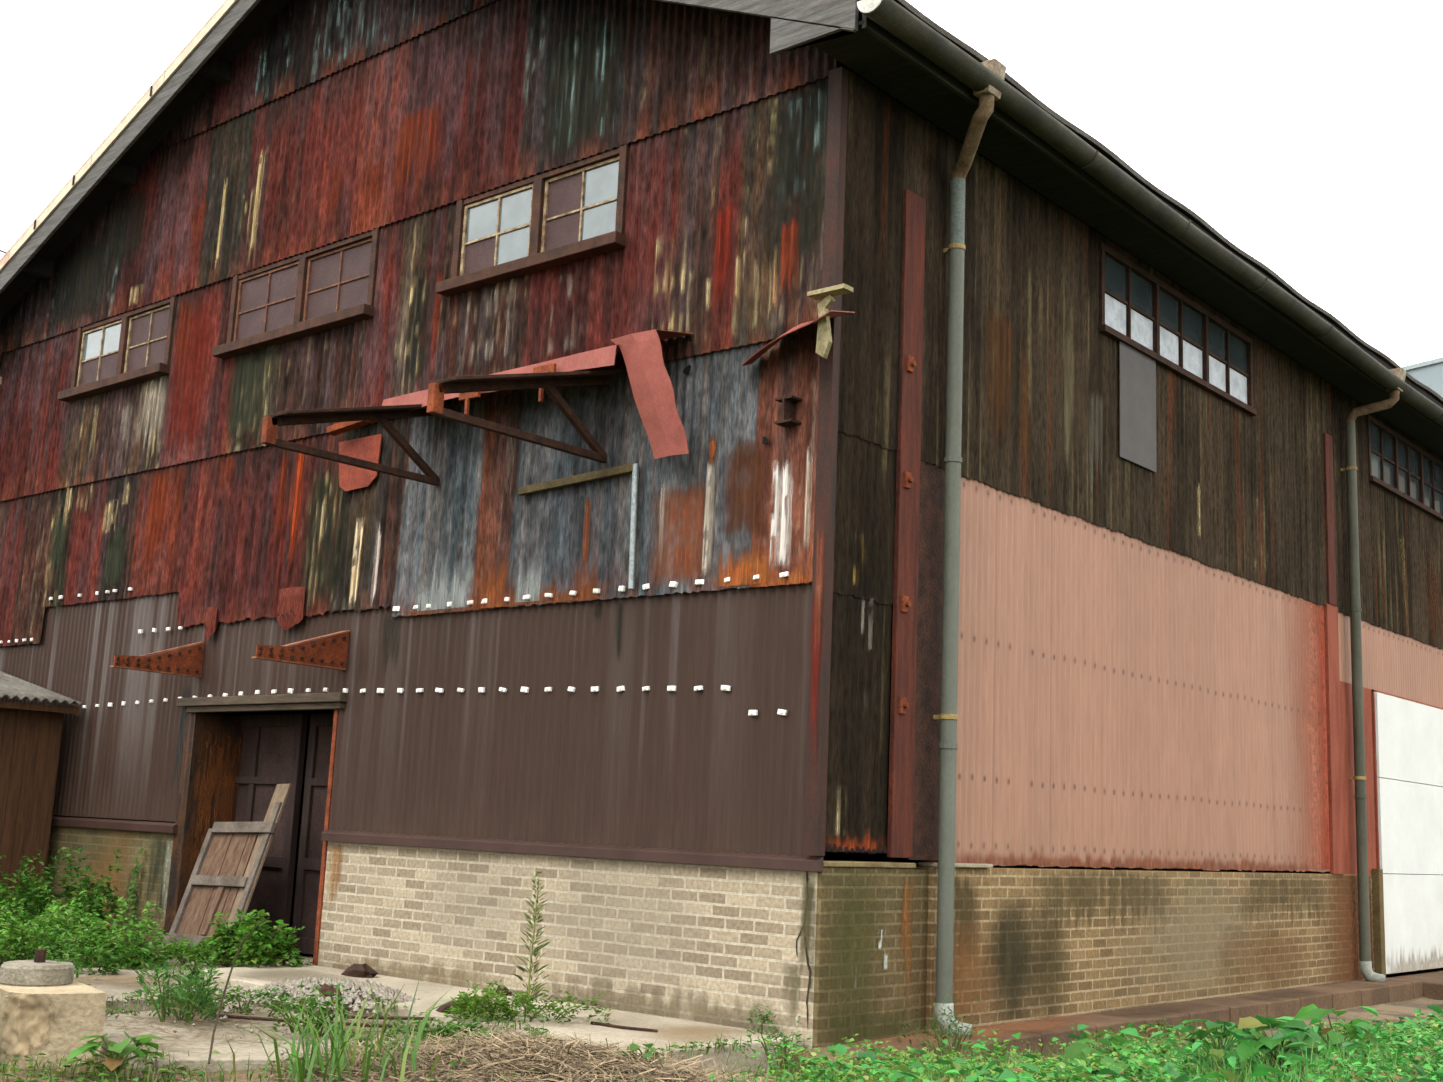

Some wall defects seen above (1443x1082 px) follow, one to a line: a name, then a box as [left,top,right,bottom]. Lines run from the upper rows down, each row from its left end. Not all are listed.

corrosion [274,453,304,548]
corrosion [410,500,596,616]
corrosion [658,489,706,577]
corrosion [726,443,763,533]
corrosion [719,538,823,723]
corrosion [1302,600,1373,983]
corrosion [833,835,877,852]
damp [954,878,975,967]
corrosion [953,948,986,1007]
damp [996,910,1061,1014]
damp [1053,874,1150,921]
corrosion [986,855,1293,871]